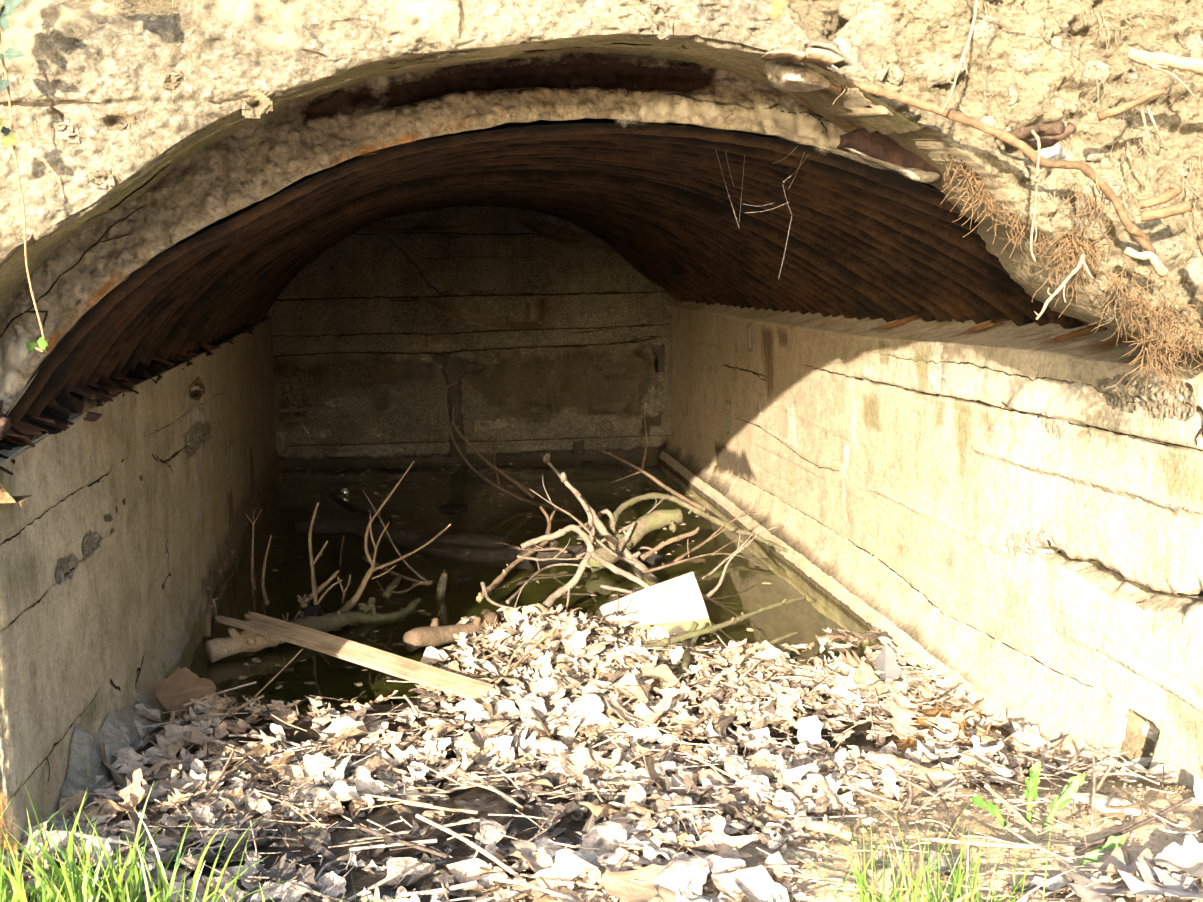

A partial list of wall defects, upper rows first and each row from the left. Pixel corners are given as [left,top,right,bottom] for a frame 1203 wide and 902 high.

crack [0,99,97,123]
rust [762,330,787,389]
rust [874,313,1031,332]
rust [1048,319,1133,350]
rust [1126,347,1182,363]
rust [0,324,253,475]
crack [801,350,1203,451]
crack [0,394,219,545]
crack [728,470,1122,703]
spalling [1024,542,1203,615]
crack [0,653,145,844]
spalling [1115,708,1160,775]